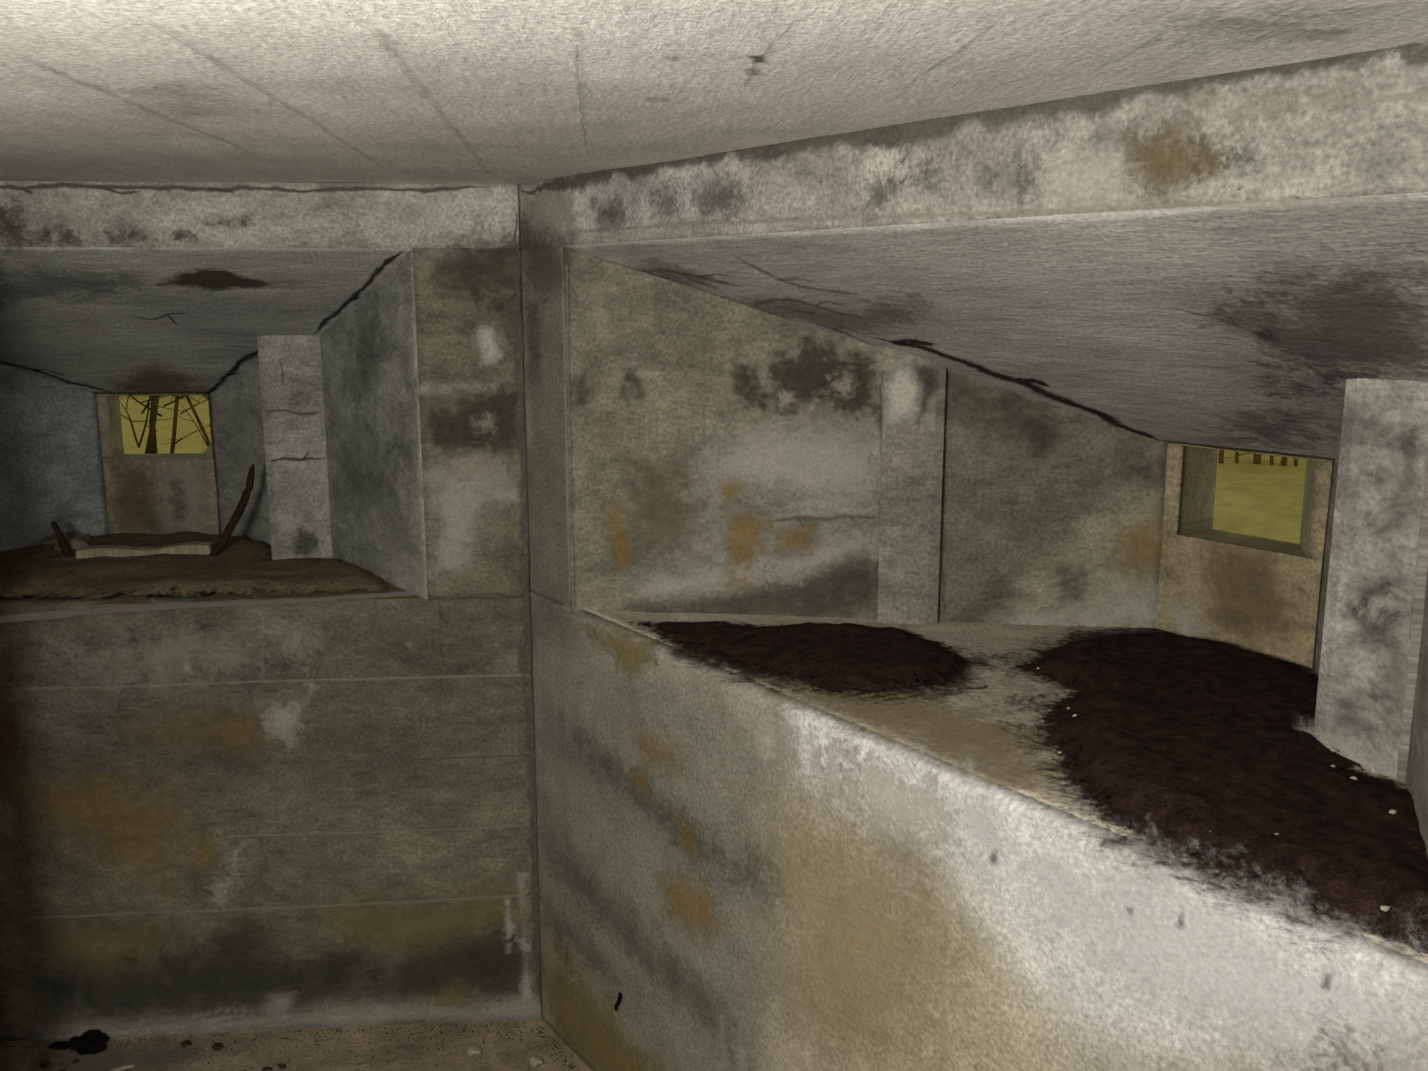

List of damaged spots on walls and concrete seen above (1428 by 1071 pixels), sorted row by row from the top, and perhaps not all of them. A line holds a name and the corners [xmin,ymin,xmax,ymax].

crack [0,182,491,194]
damp [1064,126,1218,192]
crack [137,313,185,324]
crack [314,250,405,334]
damp [1217,278,1424,391]
crack [0,362,112,393]
crack [201,350,319,415]
crack [271,452,324,462]
crack [505,44,1428,1012]